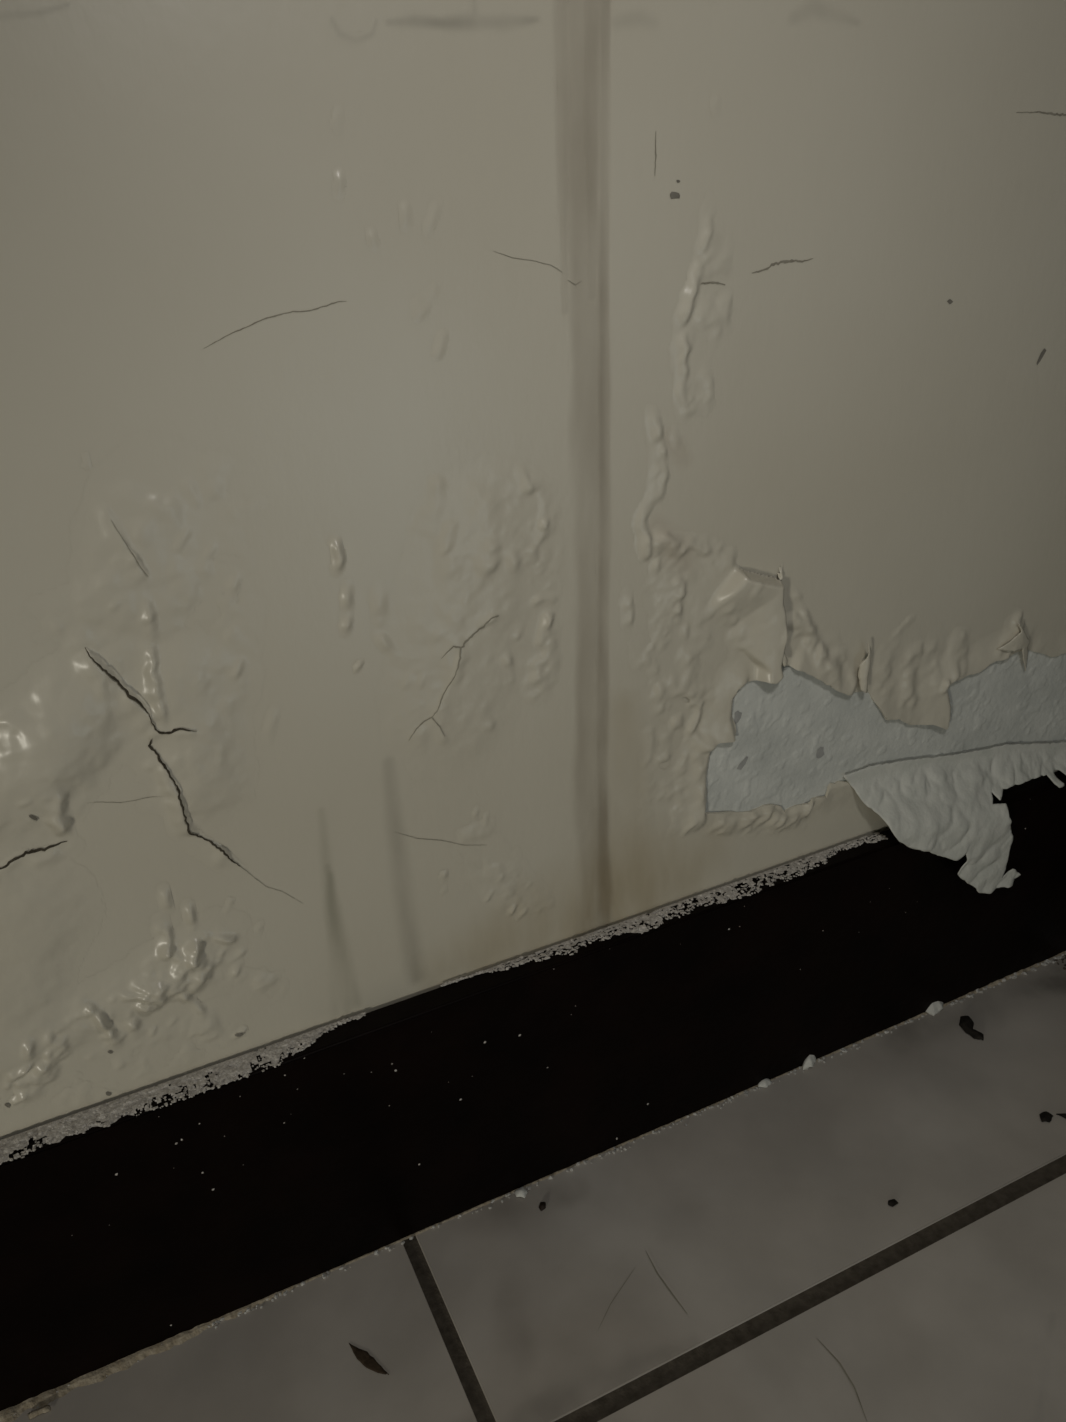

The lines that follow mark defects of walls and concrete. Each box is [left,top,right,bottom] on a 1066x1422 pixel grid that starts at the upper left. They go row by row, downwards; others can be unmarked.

crack [203,301,345,349]
crack [0,841,67,869]
crack [85,648,300,902]
crack [409,616,498,740]
peeling [618,522,1066,894]
spalling [0,882,290,1115]